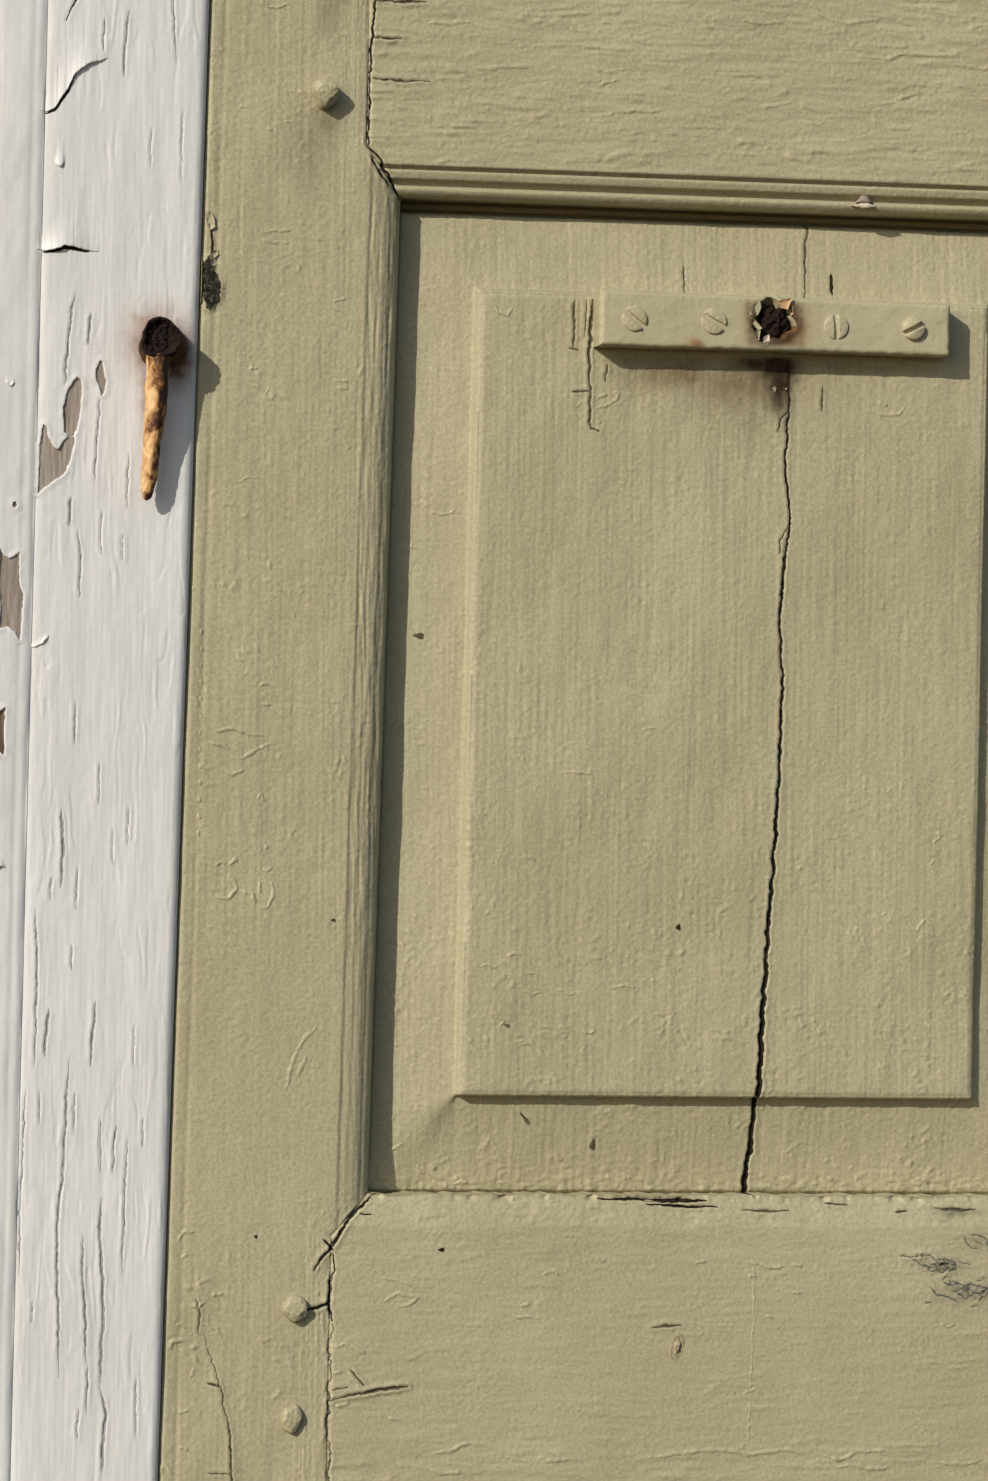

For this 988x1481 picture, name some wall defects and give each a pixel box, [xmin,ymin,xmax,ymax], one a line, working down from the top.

peeling [41,18,108,114]
crack [66,0,129,76]
crack [367,0,427,200]
peeling [36,204,100,253]
peeling [200,210,227,315]
rust [747,304,800,403]
peeling [6,354,113,514]
peeling [0,543,49,647]
peeling [0,702,12,762]
crack [597,362,823,1212]
crack [895,1206,974,1214]
crack [307,1196,408,1481]